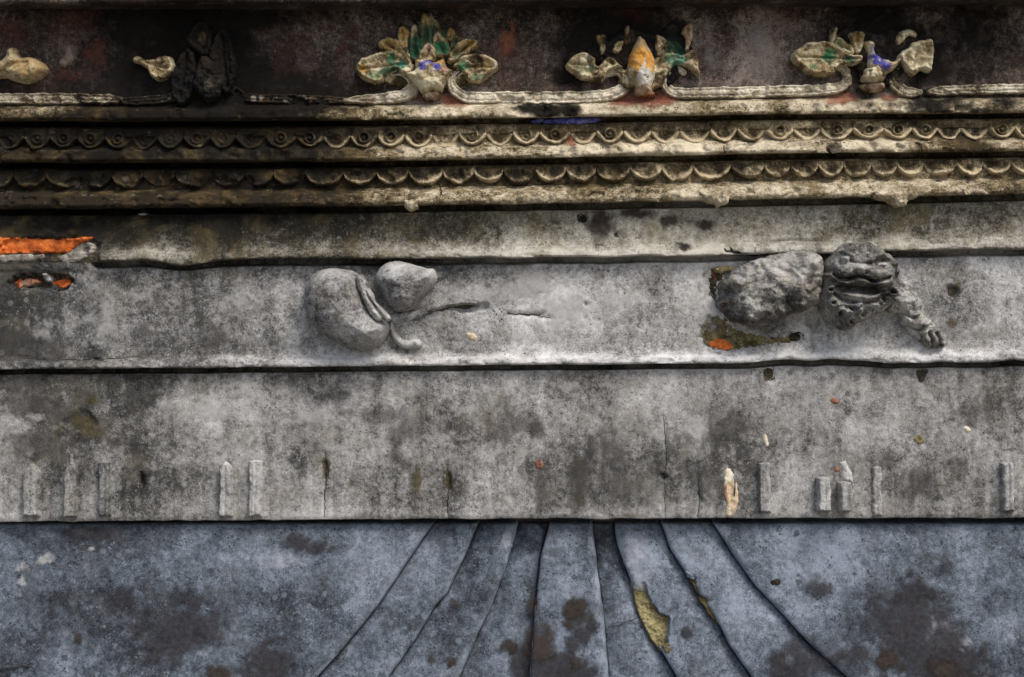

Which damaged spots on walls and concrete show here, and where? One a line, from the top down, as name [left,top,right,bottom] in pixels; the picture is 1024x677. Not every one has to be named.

spalling [0,237,96,291]
water stain [137,587,229,670]
spalling [630,580,672,654]
spalling [684,570,719,624]
water stain [770,569,988,677]
water stain [239,637,293,677]
water stain [510,647,599,677]